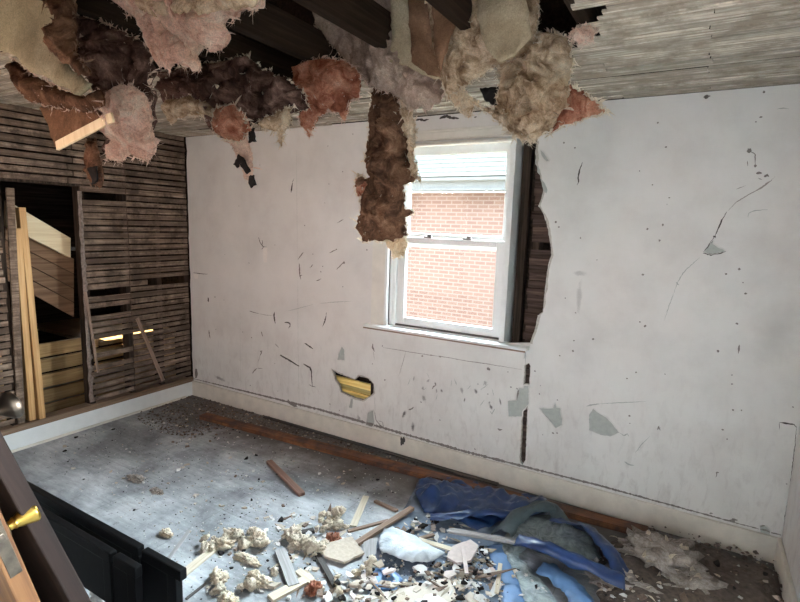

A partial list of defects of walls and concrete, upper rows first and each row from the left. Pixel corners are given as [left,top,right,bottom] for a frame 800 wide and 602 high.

crack [729,148,772,210]
spalling [530,141,560,344]
spalling [331,346,375,411]
peeling [507,385,541,418]
peeling [539,399,564,435]
peeling [588,408,620,437]